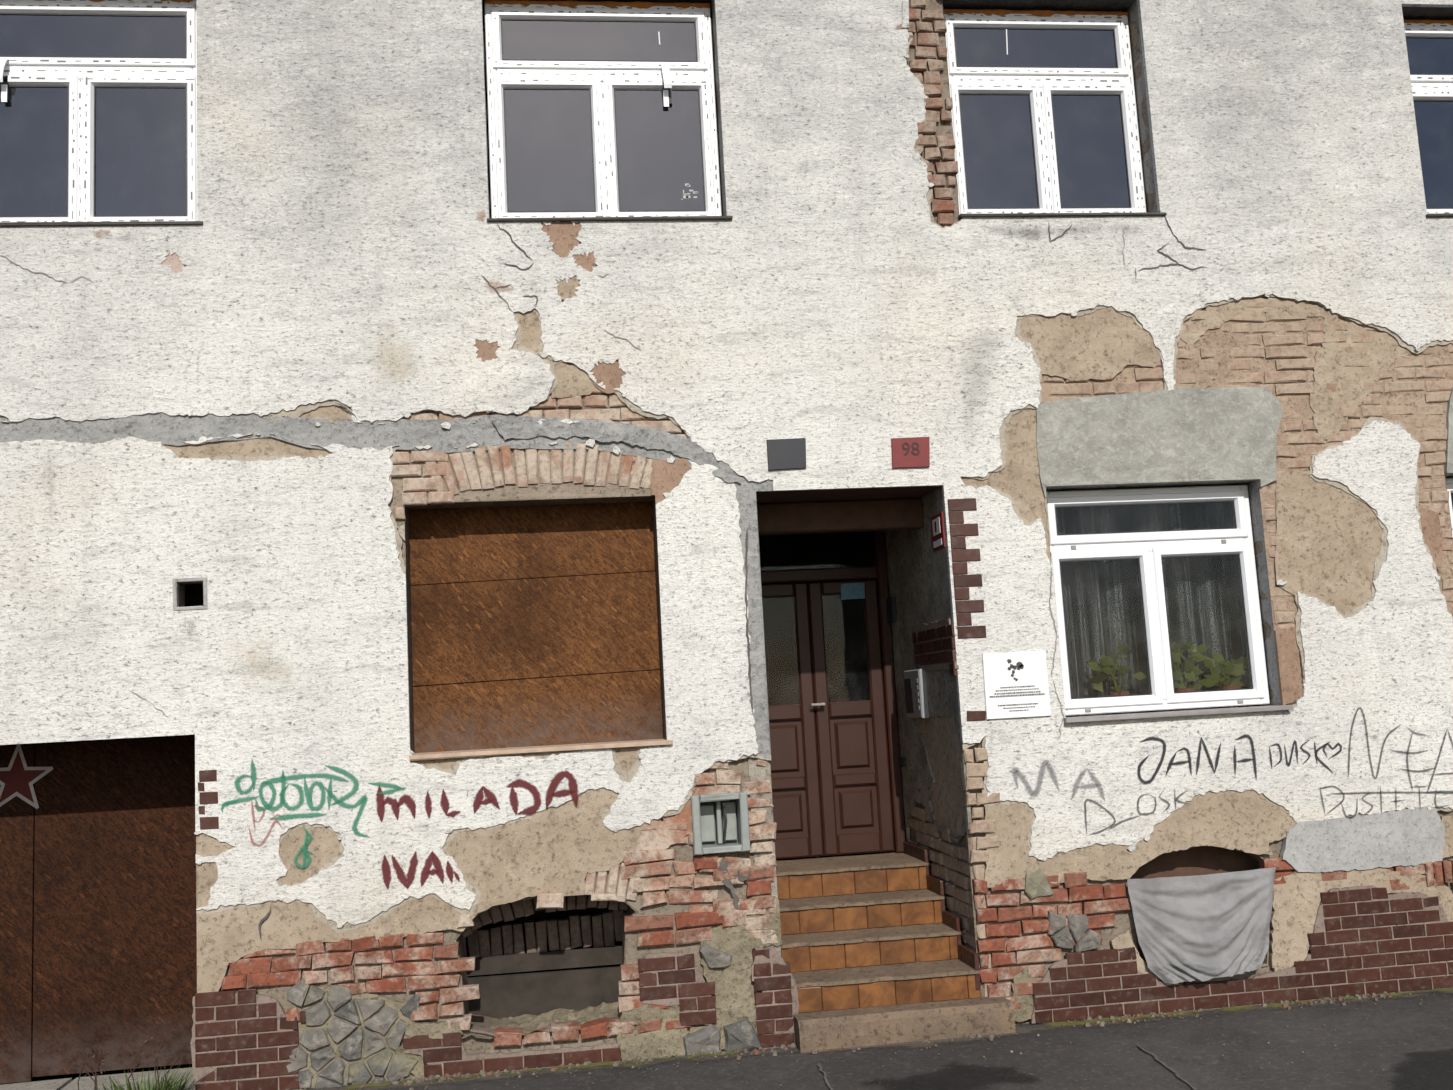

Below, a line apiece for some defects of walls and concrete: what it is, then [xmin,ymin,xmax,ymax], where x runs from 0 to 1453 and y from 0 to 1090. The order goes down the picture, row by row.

spalling [896,0,961,228]
crack [1048,224,1072,242]
crack [1122,216,1207,279]
spalling [162,400,353,464]
spalling [388,309,691,574]
spalling [961,290,1453,712]
spalling [404,750,586,775]
spalling [194,831,235,916]
spalling [276,822,345,900]
flaking render [584,751,778,1012]
flaking render [908,748,1132,1010]
flaking render [221,922,480,1031]